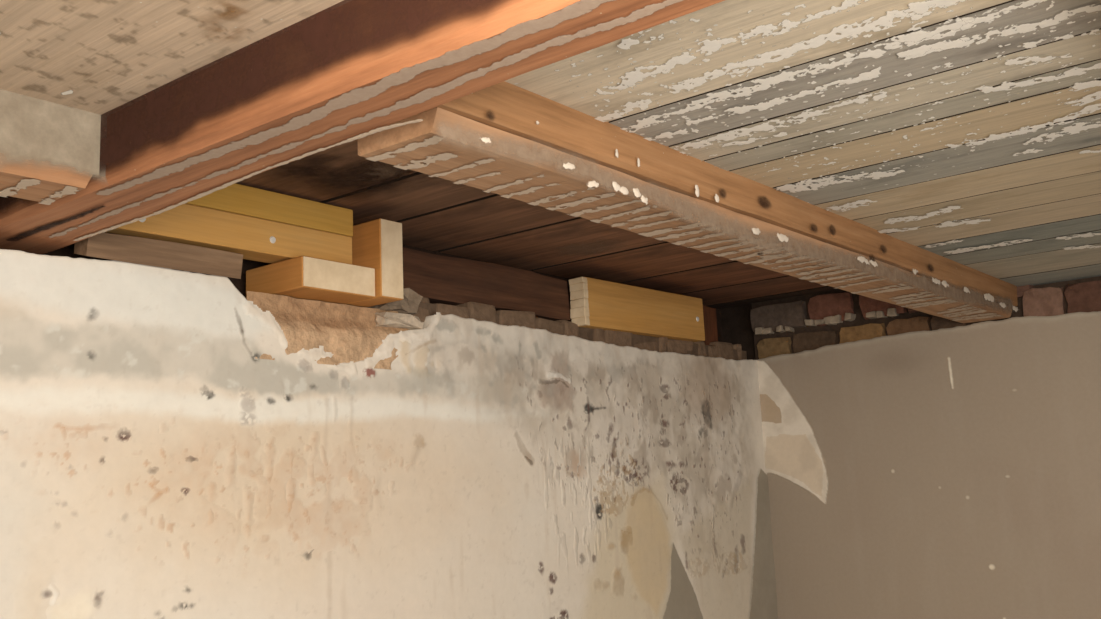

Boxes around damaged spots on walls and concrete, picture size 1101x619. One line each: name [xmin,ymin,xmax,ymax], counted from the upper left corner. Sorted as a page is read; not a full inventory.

damp [49,0,683,241]
damp [0,196,28,212]
damp [198,383,218,402]
damp [236,386,295,428]
damp [295,357,356,493]
damp [361,367,377,379]
damp [511,348,752,619]
flaking render [242,276,1101,418]
damp [760,394,828,505]